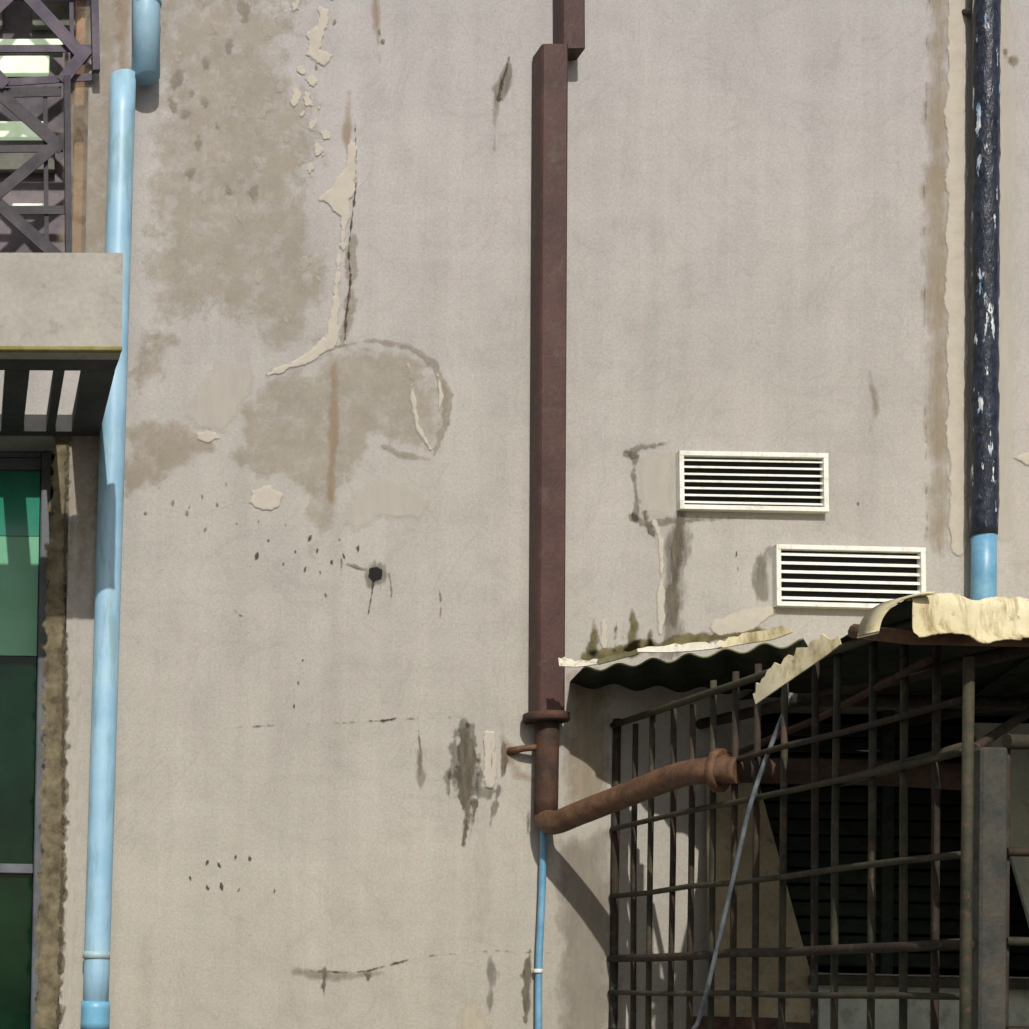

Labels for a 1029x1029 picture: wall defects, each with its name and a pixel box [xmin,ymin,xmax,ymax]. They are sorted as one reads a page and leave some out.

spalling [170,69,190,116]
peeling [290,6,336,173]
peeling [266,141,358,375]
crack [344,128,357,339]
leakage [944,0,970,555]
peeling [250,486,283,522]
spalling [330,553,393,614]
leakage [582,510,777,661]
leakage [445,718,500,845]
crack [296,954,434,989]